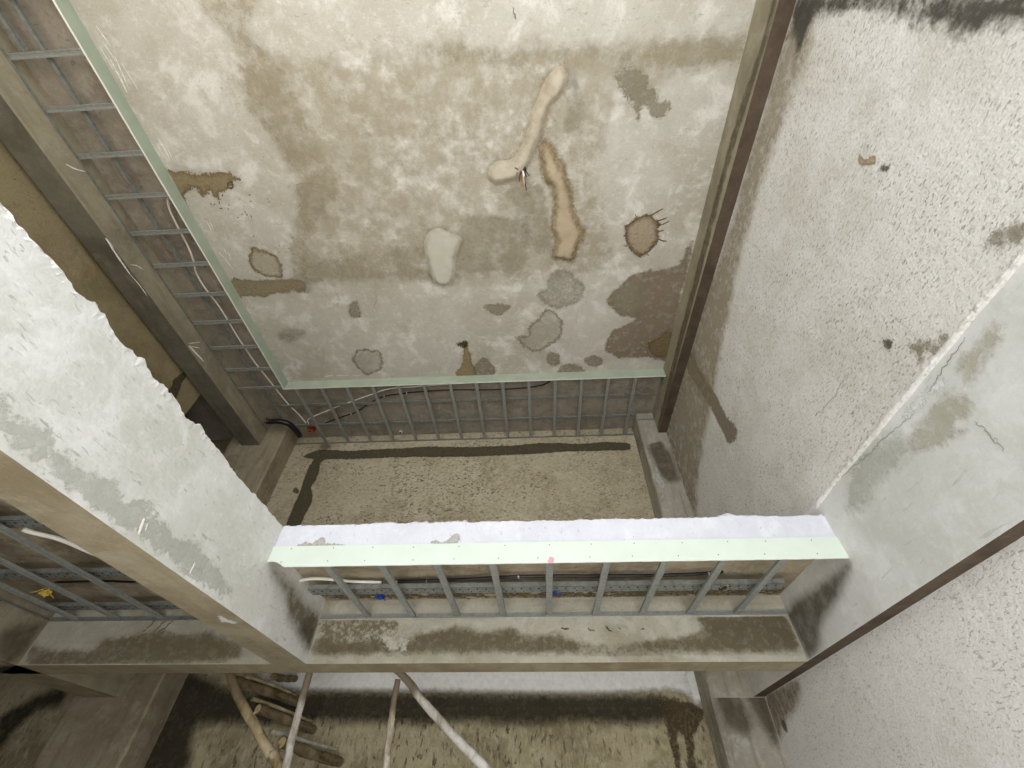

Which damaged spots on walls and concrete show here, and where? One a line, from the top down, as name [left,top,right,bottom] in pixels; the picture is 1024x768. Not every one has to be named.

leakage [517,0,1024,509]
spalling [0,203,555,546]
spalling [574,513,822,523]
leakage [281,581,589,655]
leakage [608,572,844,655]
leakage [0,627,704,768]